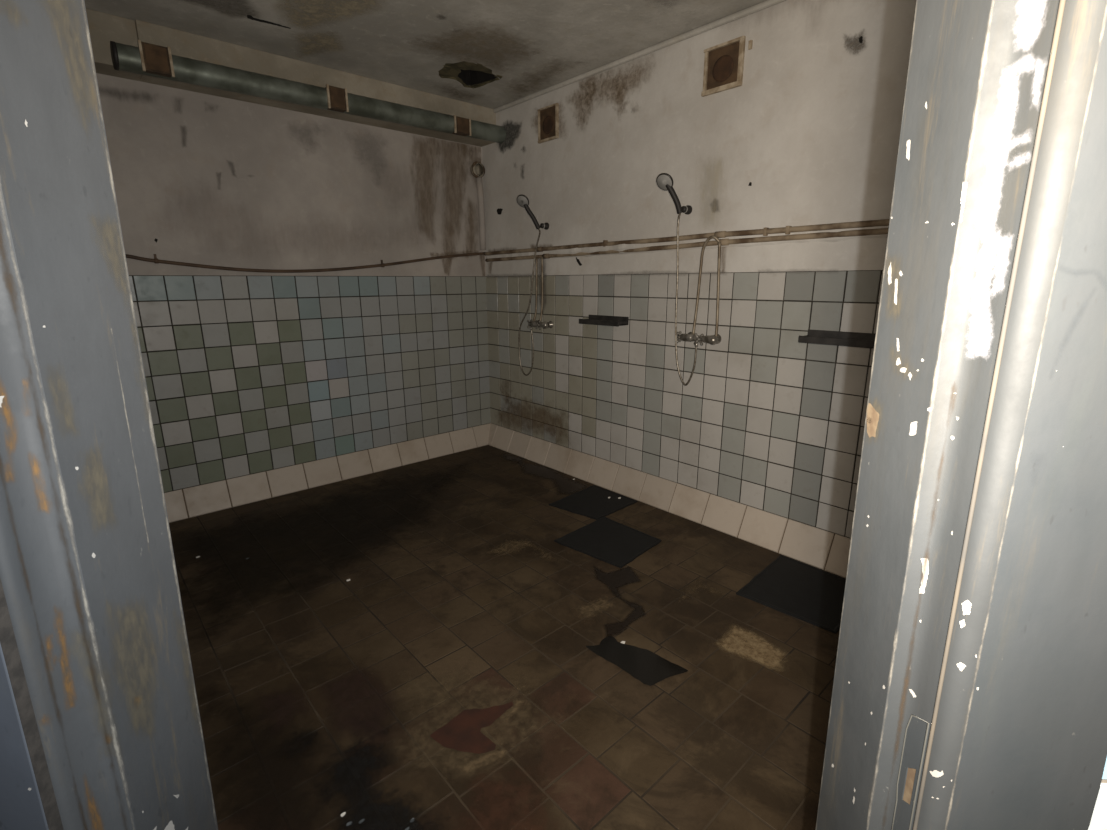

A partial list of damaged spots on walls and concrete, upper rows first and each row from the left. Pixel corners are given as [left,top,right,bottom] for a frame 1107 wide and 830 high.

peeling [919,558,929,593]
peeling [959,600,972,628]